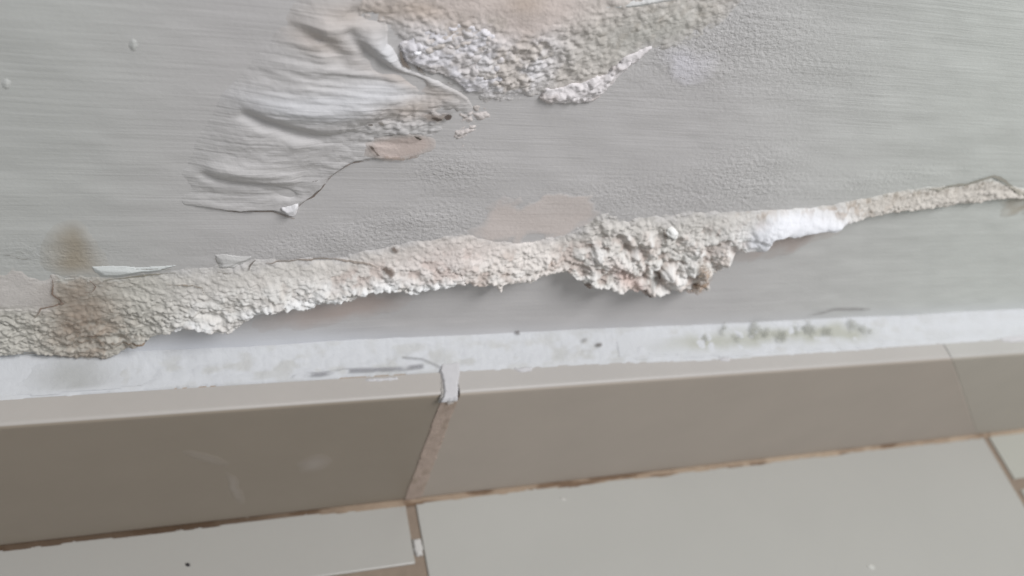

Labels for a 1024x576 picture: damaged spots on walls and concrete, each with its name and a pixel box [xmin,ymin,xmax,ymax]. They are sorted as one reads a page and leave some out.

spalling [357,0,742,147]
crack [219,159,373,219]
spalling [0,178,1024,359]